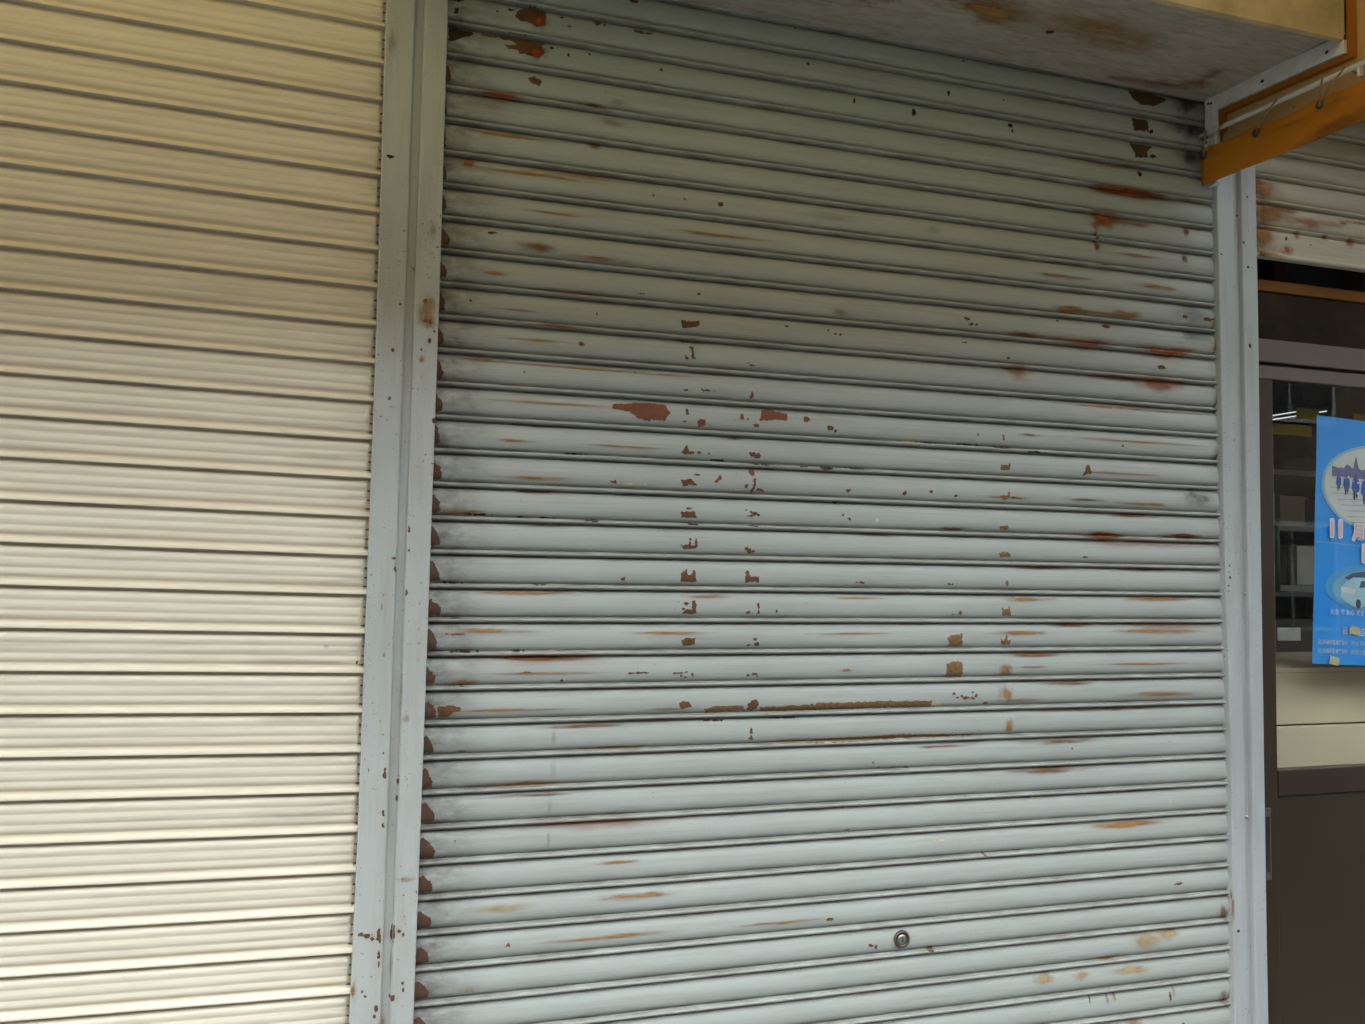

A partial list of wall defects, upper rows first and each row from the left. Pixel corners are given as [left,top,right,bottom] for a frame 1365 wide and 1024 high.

corrosion [483,91,518,102]
corrosion [1093,185,1160,199]
corrosion [1243,180,1365,268]
corrosion [1092,215,1143,248]
corrosion [1059,306,1138,318]
corrosion [1149,347,1187,358]
corrosion [1017,653,1051,668]